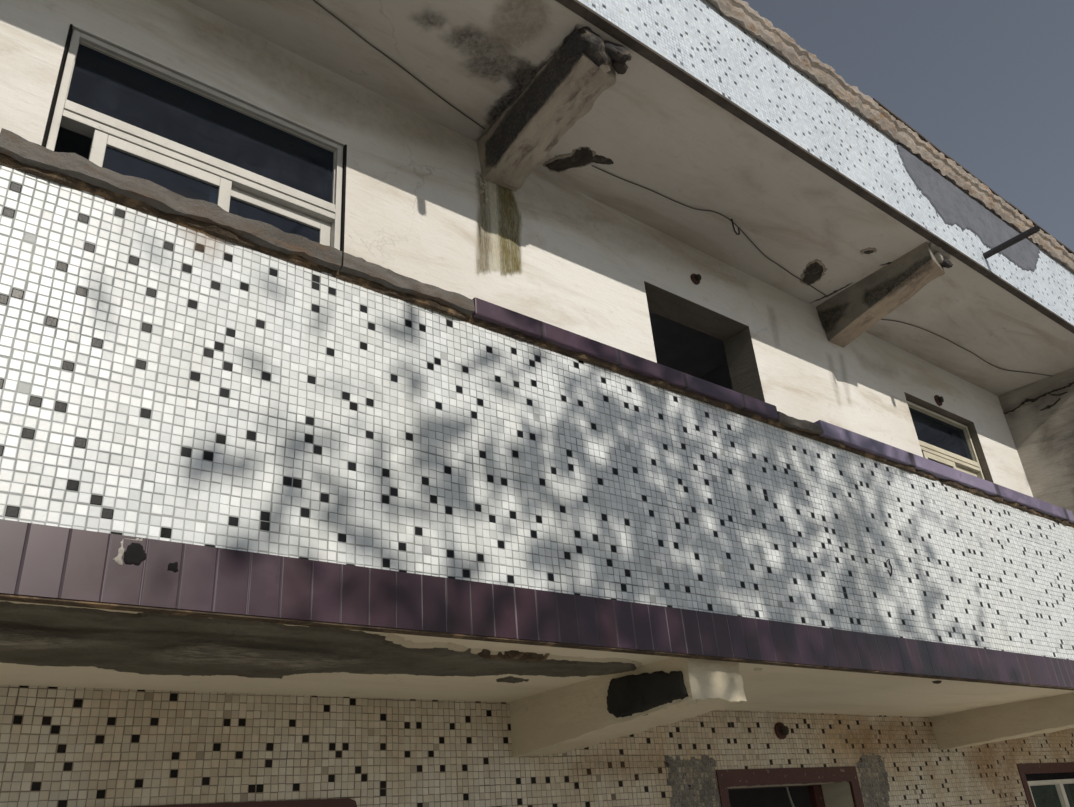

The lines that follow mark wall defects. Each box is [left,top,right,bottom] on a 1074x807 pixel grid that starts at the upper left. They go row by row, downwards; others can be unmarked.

spalling [563,26,632,74]
leakage [453,27,588,167]
spalling [543,146,614,173]
leakage [489,182,521,274]
spalling [800,259,827,286]
spalling [929,242,954,276]
crack [1004,382,1074,414]
spalling [113,538,146,567]
peeling [0,600,143,614]
peeling [352,630,642,669]